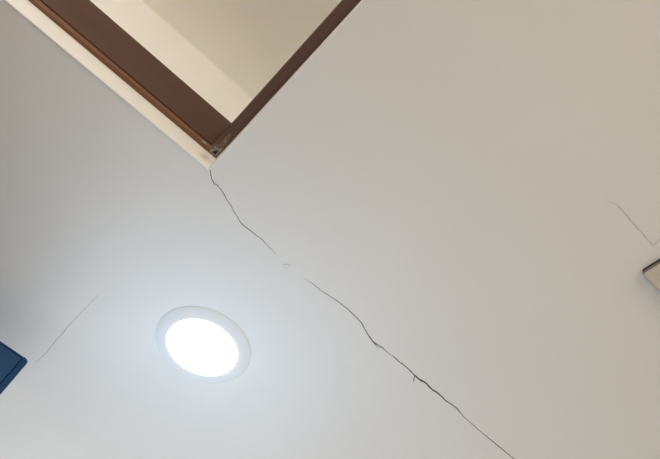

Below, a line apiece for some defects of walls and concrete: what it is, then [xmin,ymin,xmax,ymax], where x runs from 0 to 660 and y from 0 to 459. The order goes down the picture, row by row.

crack [209,170,291,268]
crack [309,281,514,459]